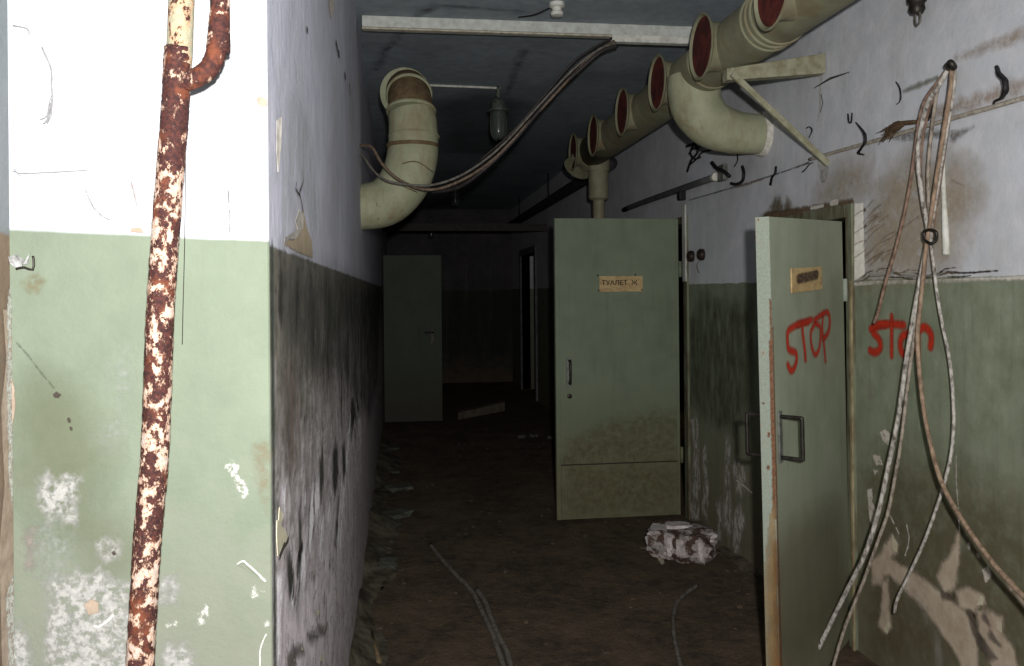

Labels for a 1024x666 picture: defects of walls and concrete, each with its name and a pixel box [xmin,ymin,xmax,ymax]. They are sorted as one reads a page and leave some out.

damp [871,165,965,267]
damp [38,473,80,524]
damp [271,246,379,666]
rust [762,299,782,666]
damp [14,629,30,666]
damp [26,536,130,666]
peeling [871,533,1017,666]